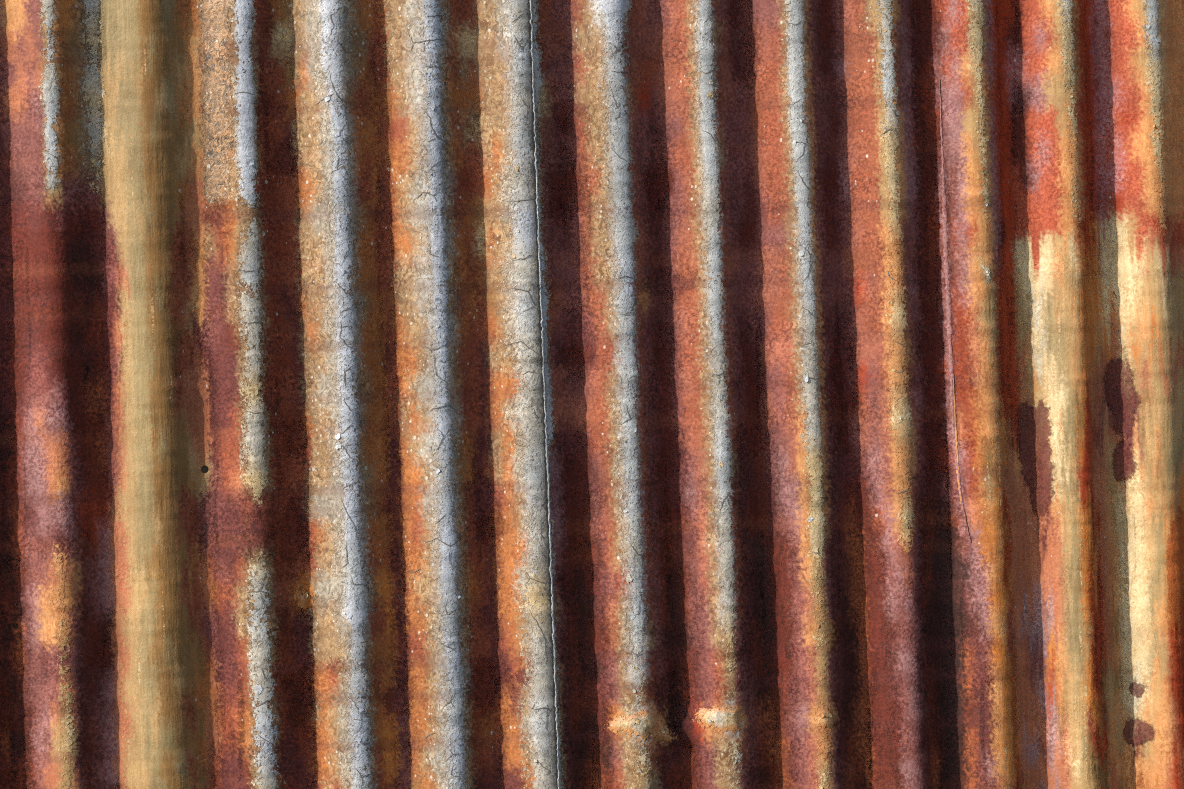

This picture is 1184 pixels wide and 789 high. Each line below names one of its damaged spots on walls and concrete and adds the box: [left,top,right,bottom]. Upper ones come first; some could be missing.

rust [0,191,123,789]
rust [164,24,322,789]
crack [315,76,348,174]
crack [335,235,419,611]
rust [371,43,414,789]
crack [407,13,450,69]
crack [417,108,456,202]
crack [423,345,459,453]
rust [462,458,531,789]
crack [503,255,536,311]
rust [643,322,704,789]
rust [909,0,1024,789]